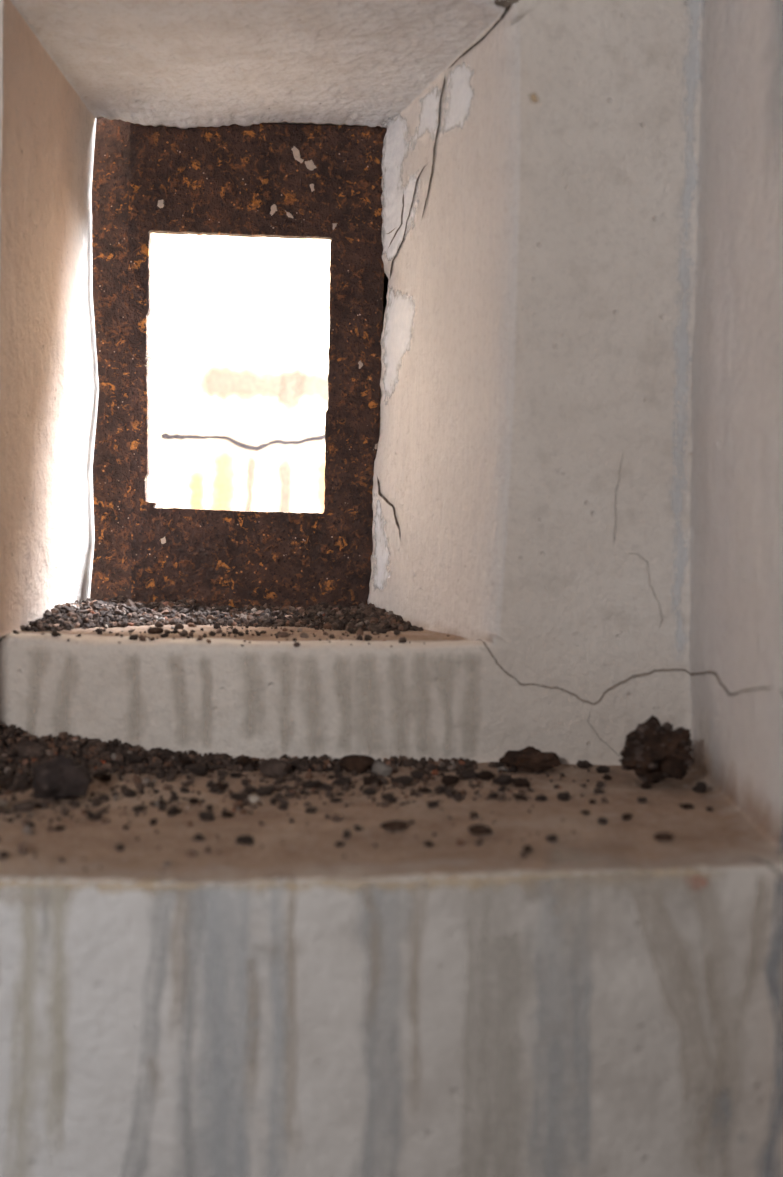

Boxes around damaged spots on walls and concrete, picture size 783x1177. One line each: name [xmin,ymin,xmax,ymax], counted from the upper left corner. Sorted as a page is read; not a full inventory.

crack [387,5,512,277]
crack [614,455,663,628]
crack [475,639,783,757]